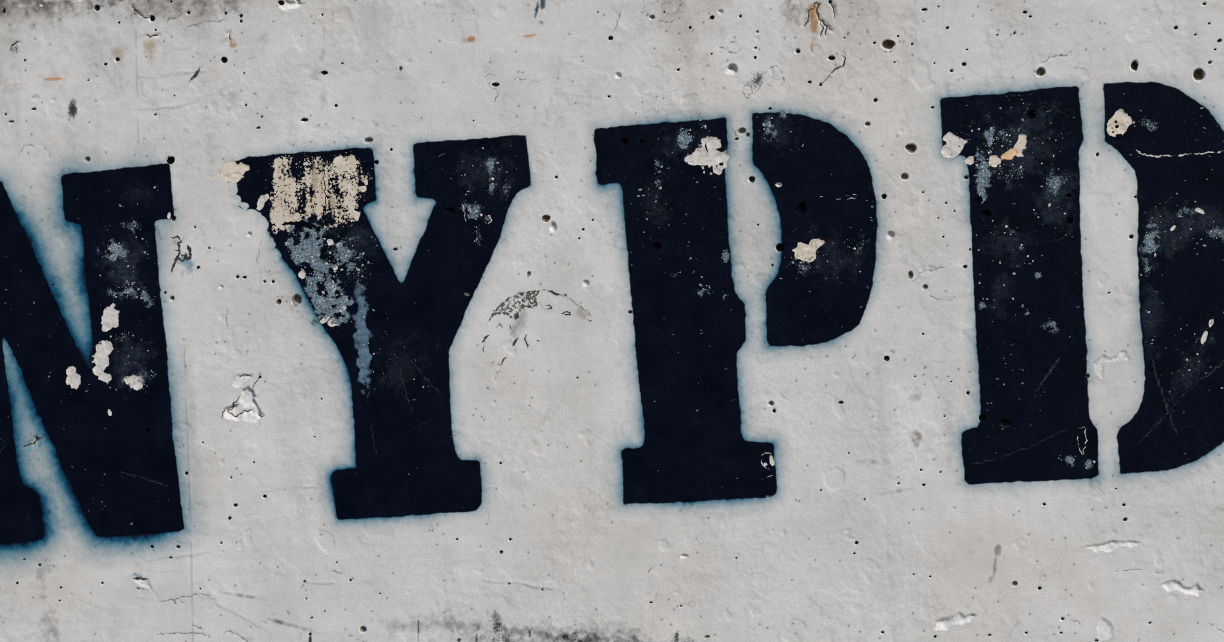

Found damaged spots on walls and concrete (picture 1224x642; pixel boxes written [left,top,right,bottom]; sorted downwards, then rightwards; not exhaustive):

peeling [1107,109,1132,140]
peeling [941,132,974,179]
peeling [989,134,1027,167]
peeling [256,152,379,255]
peeling [771,239,825,268]
peeling [320,264,349,327]
peeling [66,303,143,390]
spalling [224,374,263,427]
spalling [1084,540,1140,553]
spalling [1162,580,1204,597]
spalling [934,613,976,638]